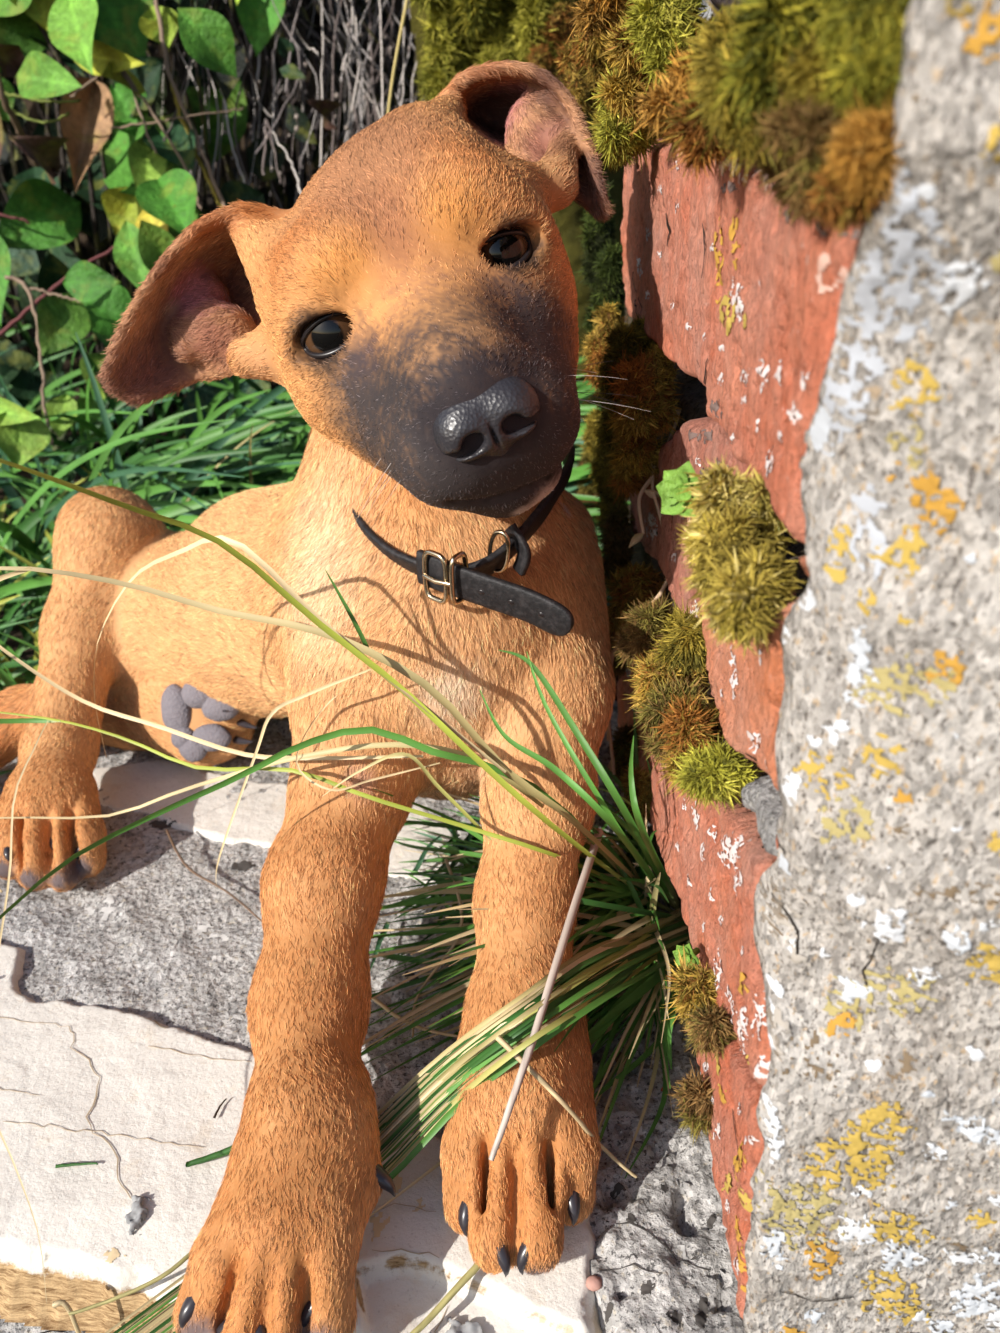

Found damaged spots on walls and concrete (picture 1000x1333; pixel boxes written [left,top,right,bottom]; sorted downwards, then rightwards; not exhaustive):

spalling [193,924,229,941]
crack [149,1020,250,1062]
crack [0,1017,204,1198]
spalling [610,1182,626,1199]
spalling [605,1302,614,1324]